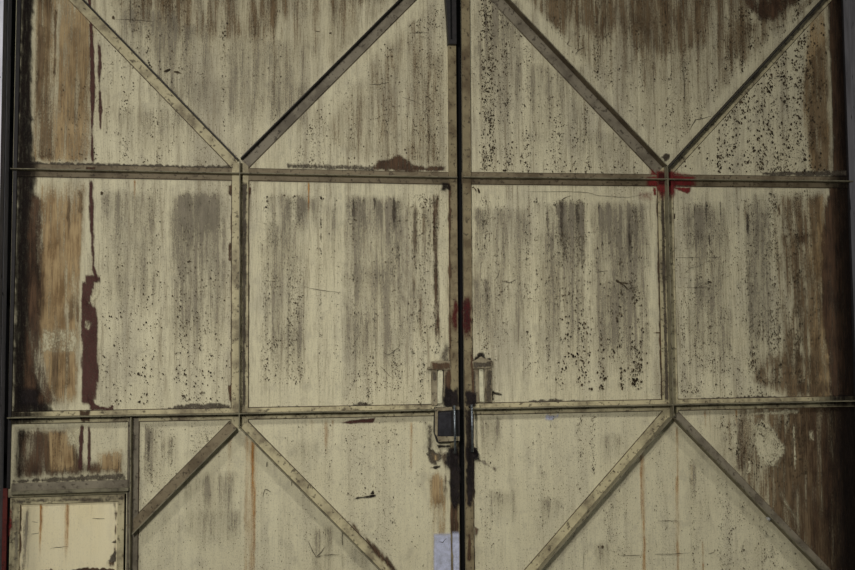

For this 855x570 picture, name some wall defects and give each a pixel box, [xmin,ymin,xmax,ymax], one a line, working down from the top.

rust [287,50,444,172]
rust [535,0,811,92]
rust [11,0,125,483]
damp [271,197,321,247]
damp [346,197,414,359]
rust [413,183,452,390]
damp [545,201,649,360]
rust [729,0,855,570]